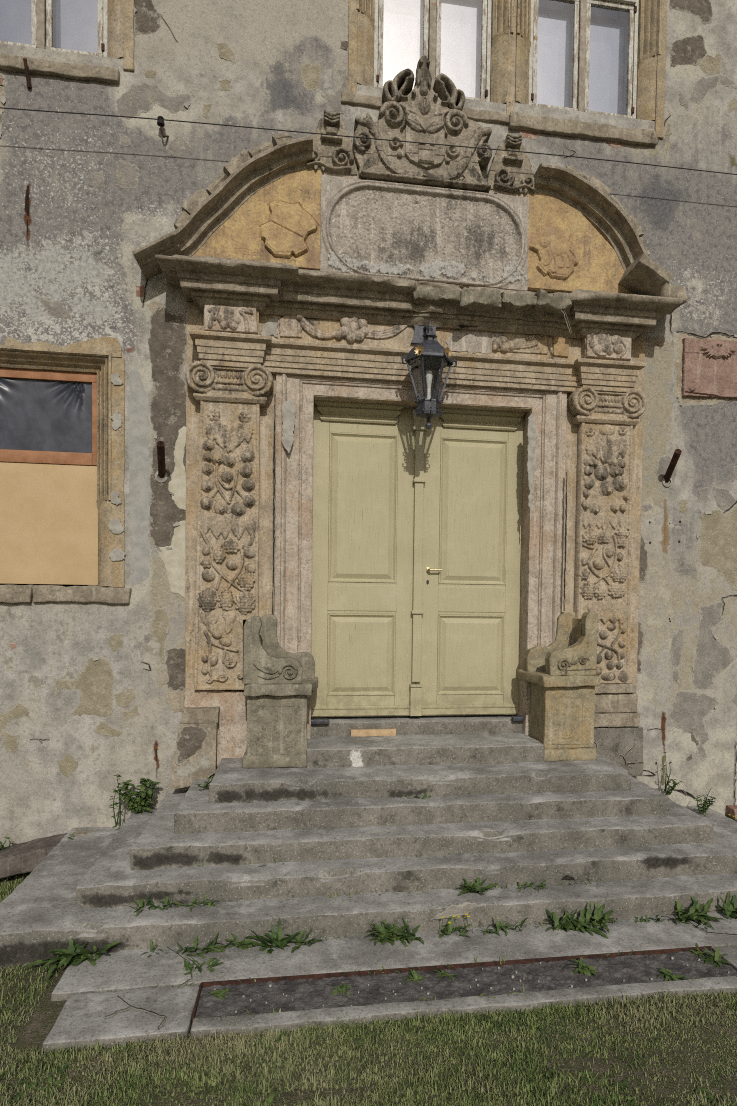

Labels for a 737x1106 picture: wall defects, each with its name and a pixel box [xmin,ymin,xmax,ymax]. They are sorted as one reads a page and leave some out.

spalling [669,0,737,113]
spalling [136,286,186,552]
flaking render [678,486,737,591]
crack [721,594,737,615]
spalling [44,633,139,737]
spalling [669,601,737,762]